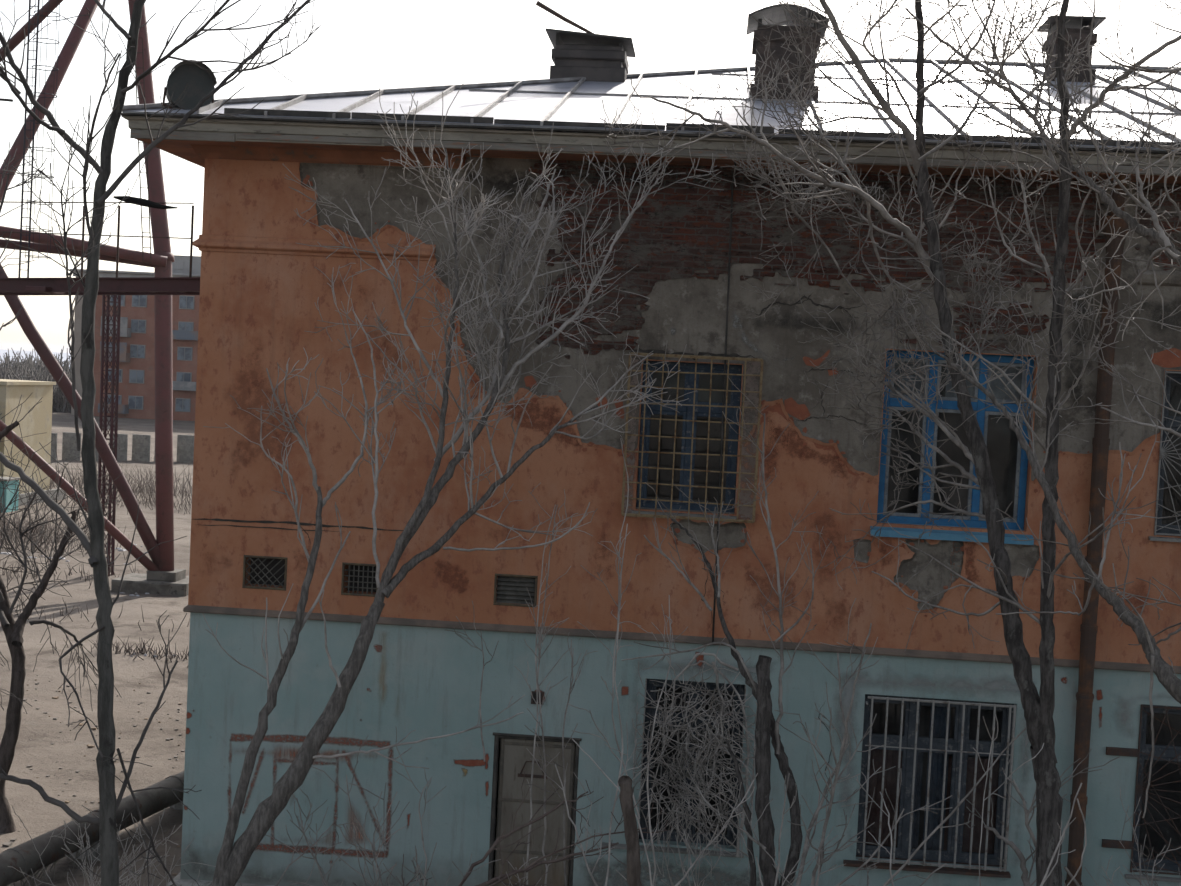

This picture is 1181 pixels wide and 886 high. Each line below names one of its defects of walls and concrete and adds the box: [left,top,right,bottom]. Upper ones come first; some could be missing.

spalling [295,157,1113,493]
spalling [1109,182,1181,457]
spalling [667,519,750,557]
spalling [881,538,976,617]
spalling [1004,541,1042,583]